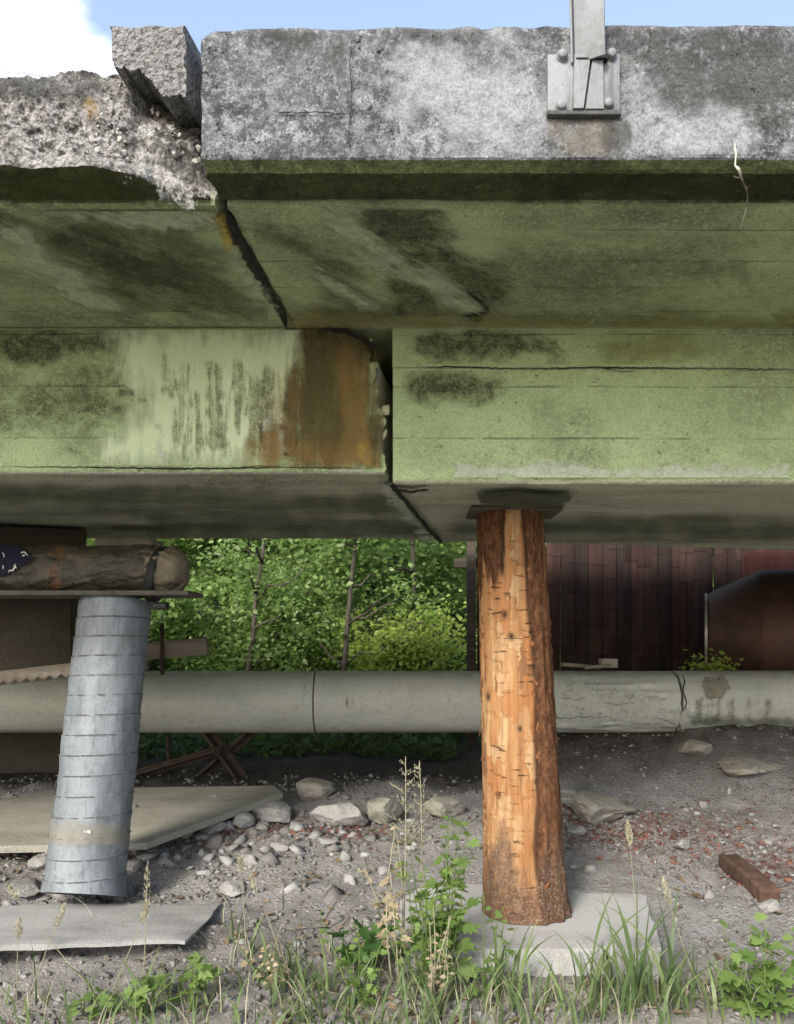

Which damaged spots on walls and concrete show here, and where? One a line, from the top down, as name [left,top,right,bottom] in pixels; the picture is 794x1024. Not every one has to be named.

spalling [89,107,216,205]
crack [734,143,750,229]
crack [217,209,376,350]
rust [245,328,384,468]
damp [0,209,794,465]
crack [402,365,794,373]
crack [388,483,442,543]